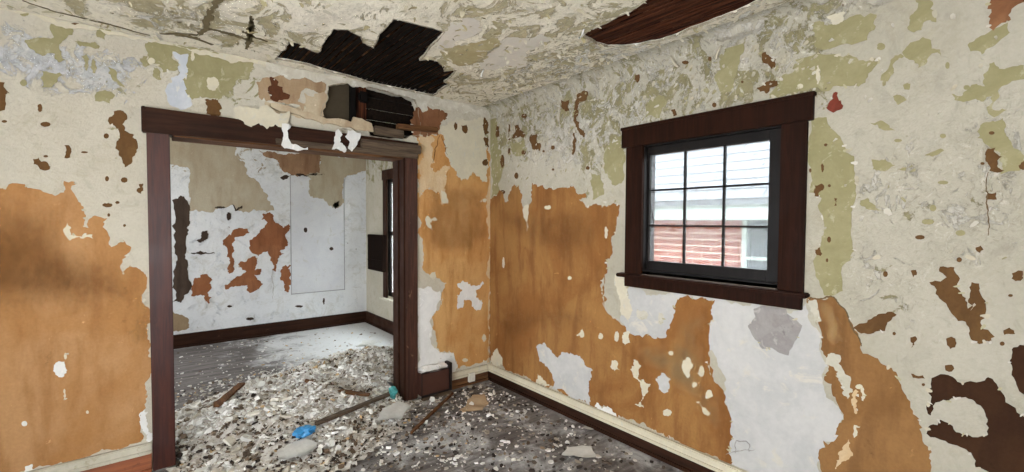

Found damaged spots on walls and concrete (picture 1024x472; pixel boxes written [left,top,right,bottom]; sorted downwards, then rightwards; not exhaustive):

peeling [33,155,50,171]
peeling [40,71,62,88]
peeling [6,0,134,73]
peeling [0,181,152,472]
peeling [170,137,291,332]
peeling [233,0,1024,472]